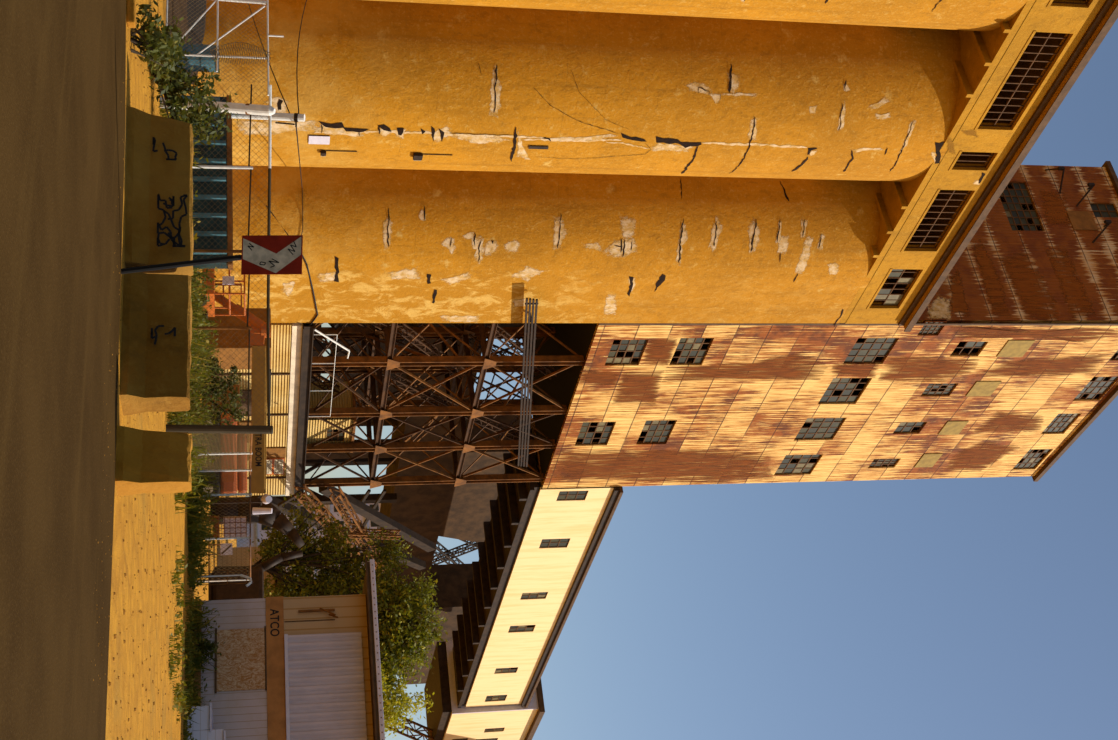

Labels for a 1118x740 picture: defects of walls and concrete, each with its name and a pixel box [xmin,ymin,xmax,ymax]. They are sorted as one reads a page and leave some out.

peeling [238,97,807,152]
crack [452,63,650,161]
spalling [687,64,756,103]
crack [837,81,915,172]
crack [676,147,698,262]
crack [776,148,825,250]
spalling [442,232,519,263]
spalling [585,217,637,257]
peeling [391,268,470,303]
rust [580,241,1118,404]
rust [550,450,773,482]
rust [947,413,1043,470]